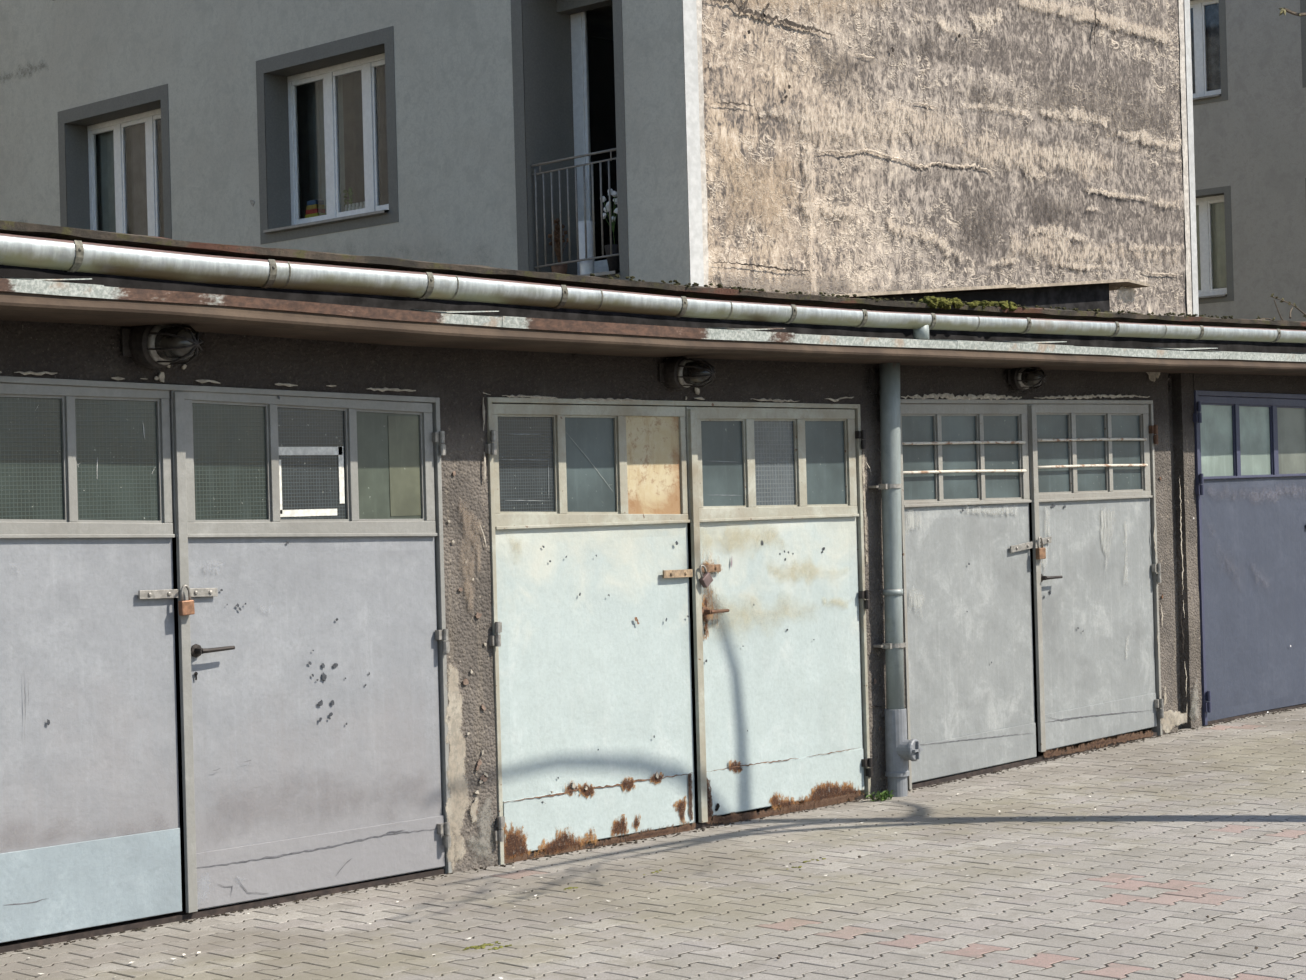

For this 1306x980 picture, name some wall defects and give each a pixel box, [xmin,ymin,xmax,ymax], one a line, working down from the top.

corrosion [701,560,722,639]
peeling [445,665,488,870]
corrosion [729,760,743,773]
corrosion [503,772,861,864]